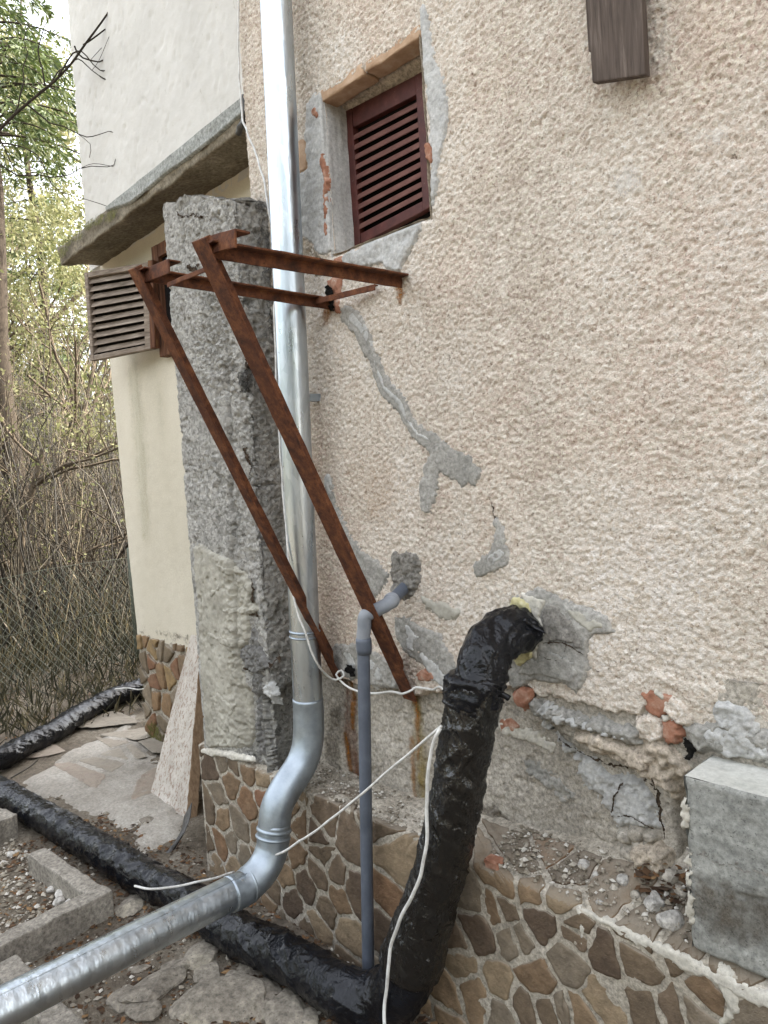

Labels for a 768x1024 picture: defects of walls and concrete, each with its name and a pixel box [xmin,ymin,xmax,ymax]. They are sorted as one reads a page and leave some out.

spalling [298,139,331,235]
flaking render [424,142,433,164]
flaking render [302,236,343,262]
flaking render [315,275,343,314]
rust [344,681,359,776]
rust [411,696,427,798]
flaking render [500,718,520,732]
flaking render [512,686,535,711]
crack [558,738,665,839]
spalling [574,670,719,804]